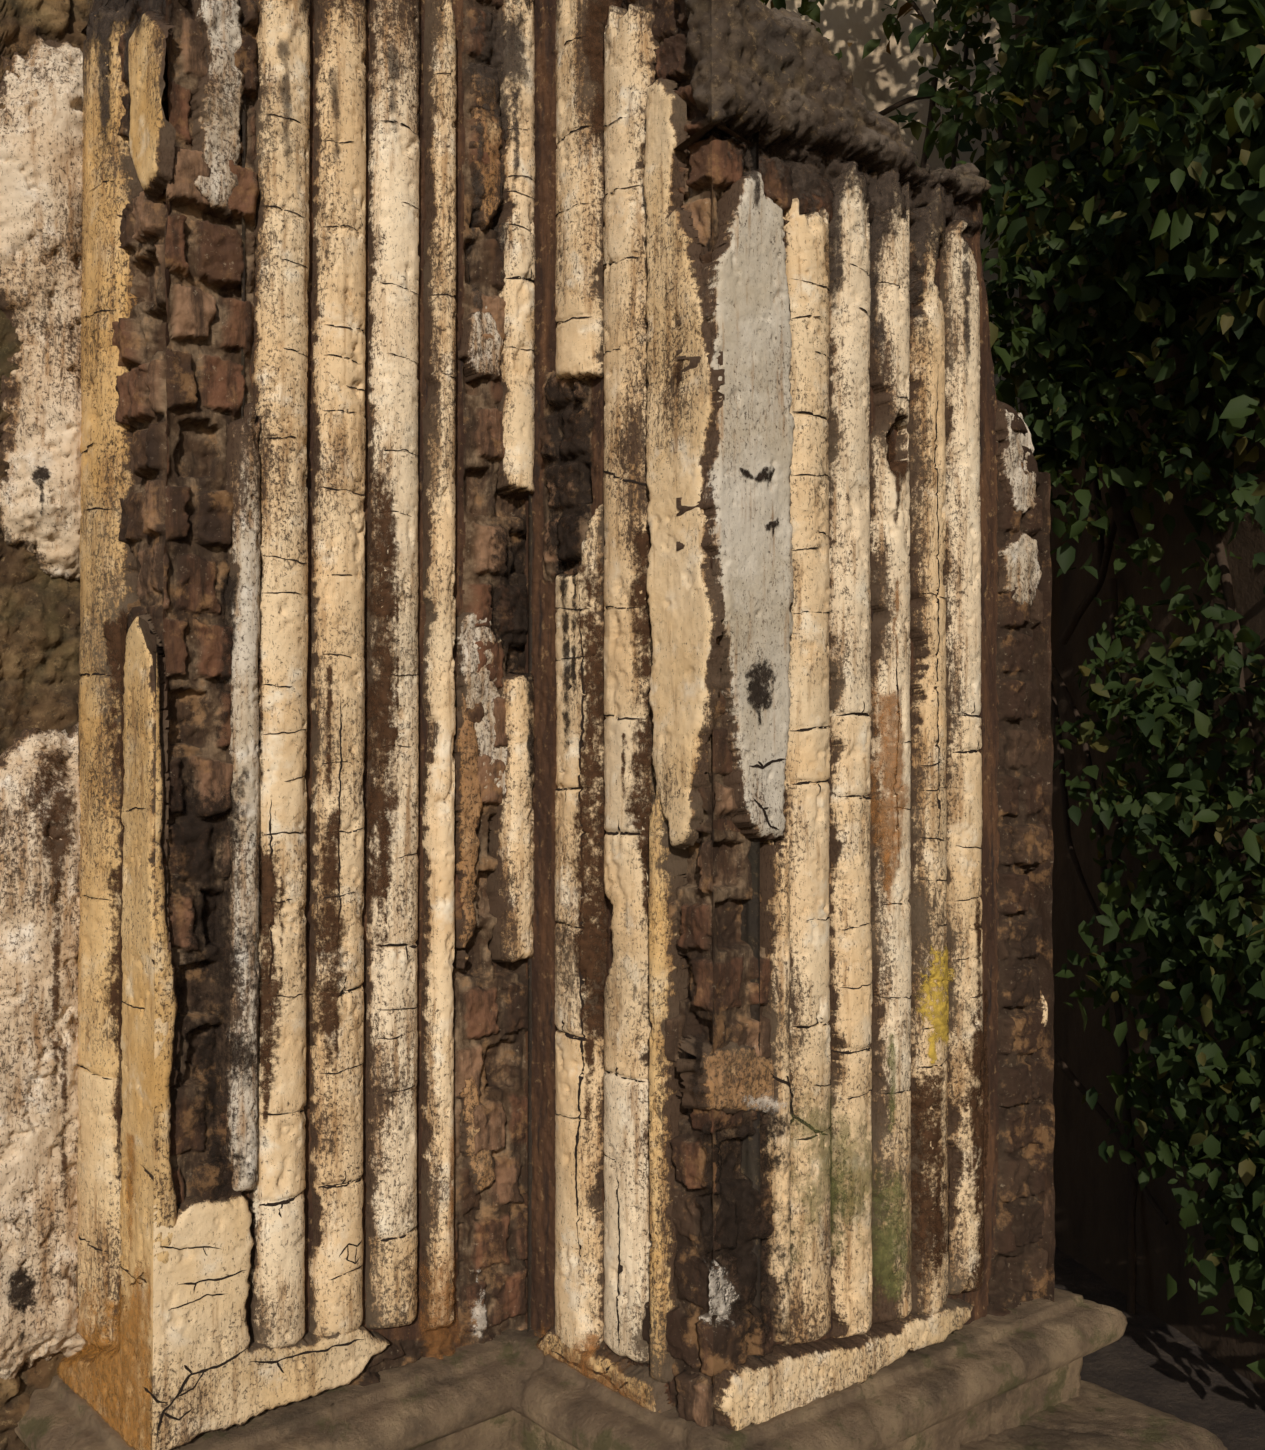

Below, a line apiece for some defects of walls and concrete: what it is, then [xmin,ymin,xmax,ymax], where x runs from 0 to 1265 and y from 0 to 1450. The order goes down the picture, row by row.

spalling [462,0,506,340]
spalling [112,0,260,1205]
leakage [364,469,399,953]
spalling [324,361,528,1391]
spalling [648,676,772,1074]
crack [751,385,982,1030]
spalling [987,400,1048,1316]
crack [79,1236,245,1311]
crack [144,1339,364,1439]
crack [331,1226,417,1280]
spalling [642,1108,784,1427]
crack [770,1013,947,1140]